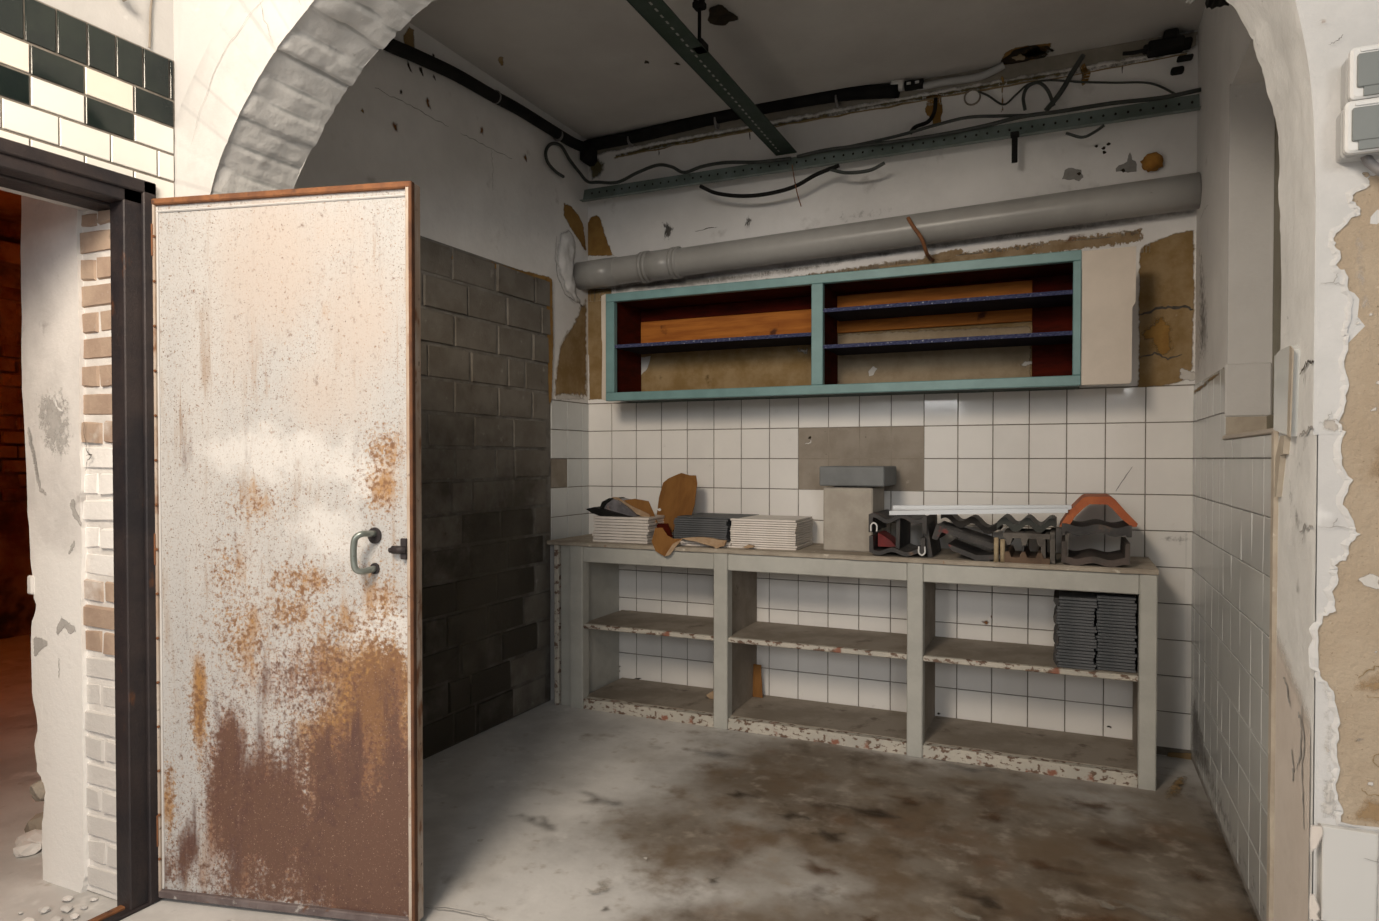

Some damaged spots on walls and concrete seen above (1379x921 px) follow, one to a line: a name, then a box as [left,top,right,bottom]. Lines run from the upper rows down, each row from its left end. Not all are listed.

spalling [489,261,611,404]
spalling [641,345,811,391]
spalling [795,229,1196,396]
flaking render [0,210,117,894]
peeling [799,426,924,491]
spalling [1308,172,1379,851]